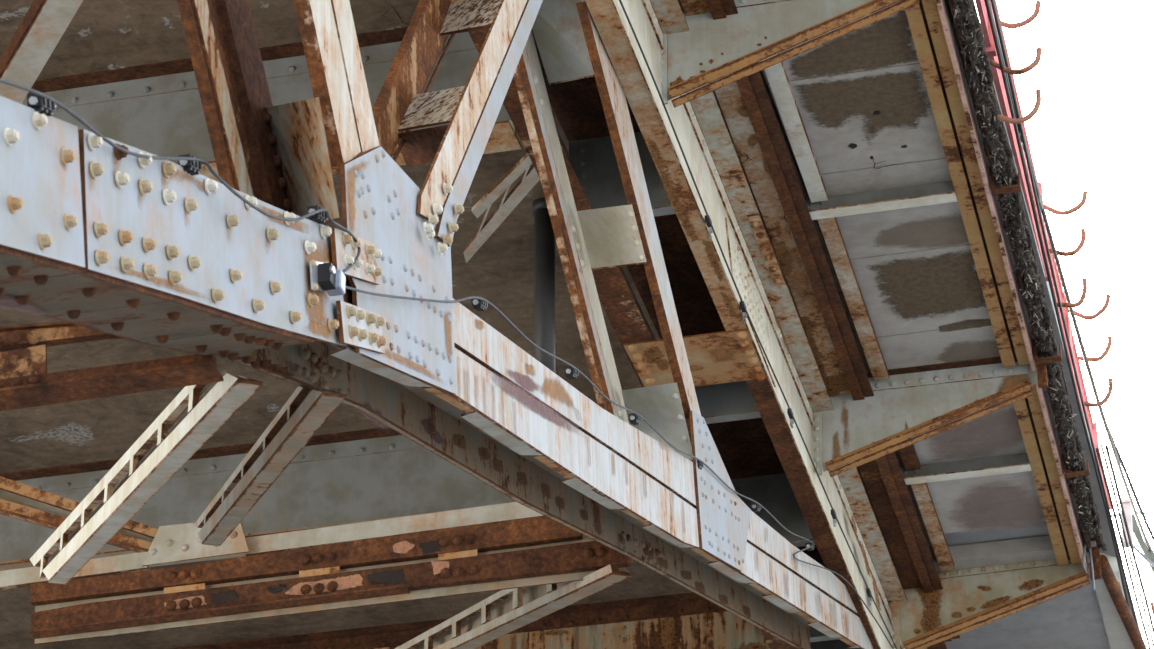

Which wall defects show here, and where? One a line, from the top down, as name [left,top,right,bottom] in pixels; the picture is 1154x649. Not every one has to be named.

corrosion [669,52,724,87]
damp [790,10,930,140]
corrosion [648,140,736,318]
damp [870,216,1000,363]
corrosion [643,348,670,371]
peeling [393,539,449,575]
peeling [164,590,239,609]
peeling [268,569,407,595]
corrosion [913,579,1044,634]